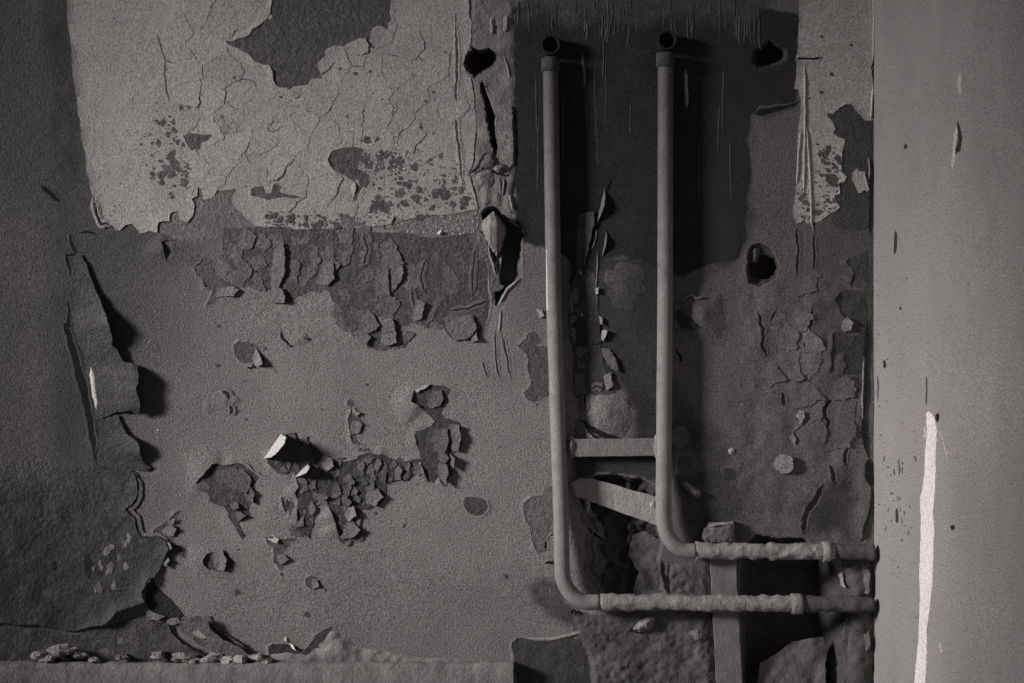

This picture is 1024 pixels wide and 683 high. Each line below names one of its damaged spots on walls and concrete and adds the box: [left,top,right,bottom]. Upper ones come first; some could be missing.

crack [157,0,470,227]
flaking render [107,0,526,351]
peeling [795,106,872,231]
peeling [514,308,549,407]
crack [756,310,778,357]
crack [779,393,790,405]
crack [802,307,817,348]
crack [798,319,870,534]
peeling [819,249,890,382]
peeling [142,374,470,625]
peeling [520,484,554,557]
flaking render [568,472,710,596]